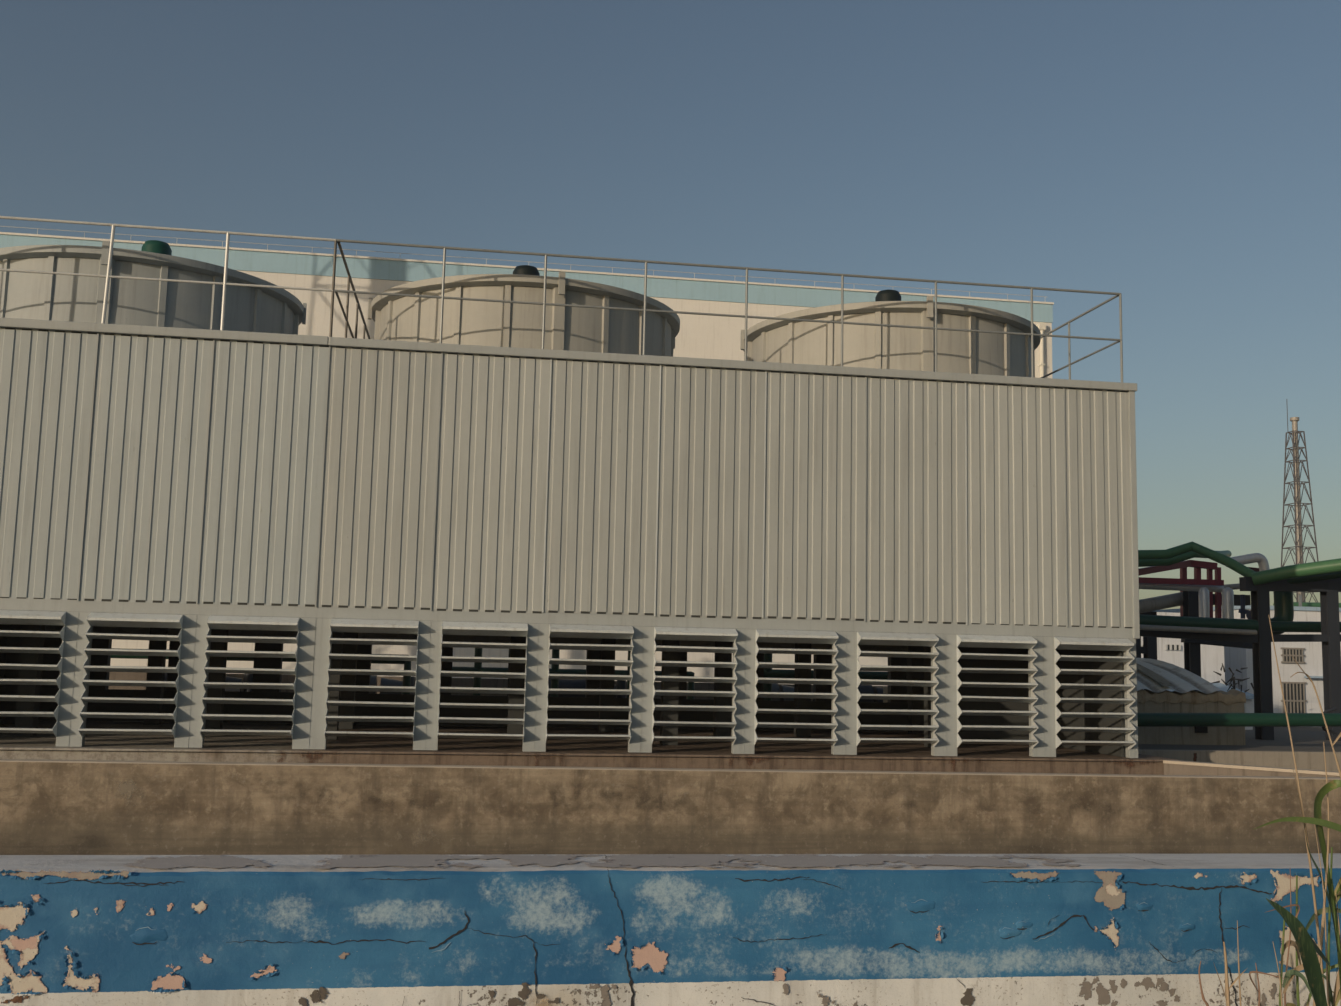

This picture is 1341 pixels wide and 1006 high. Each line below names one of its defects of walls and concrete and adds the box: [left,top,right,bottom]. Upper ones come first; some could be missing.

peeling [312,854,1080,882]
peeling [1240,870,1321,903]
peeling [191,901,207,914]
peeling [1094,871,1125,950]
peeling [0,869,132,1004]
crack [605,855,635,1006]
peeling [605,936,668,975]
peeling [148,964,186,994]
peeling [248,964,277,981]
spalling [488,982,559,1006]
peeling [772,965,789,995]
spalling [1074,977,1180,1006]